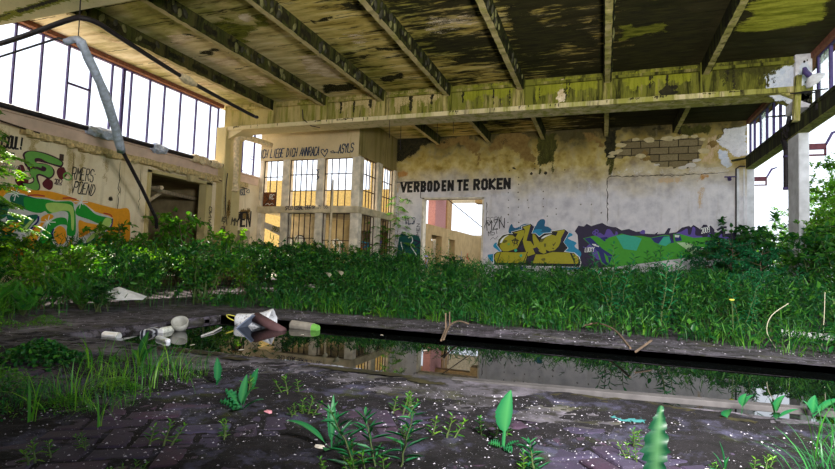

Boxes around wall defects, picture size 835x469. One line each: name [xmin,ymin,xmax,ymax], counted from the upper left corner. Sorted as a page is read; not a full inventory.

water stain [199,48,275,86]
water stain [212,14,270,43]
water stain [298,54,360,94]
water stain [425,14,503,63]
water stain [495,0,602,61]
water stain [550,79,596,107]
water stain [613,0,716,100]
water stain [730,0,835,57]
peeling [765,59,812,104]
water stain [397,132,558,175]
spalling [607,126,748,173]
crack [606,172,724,221]